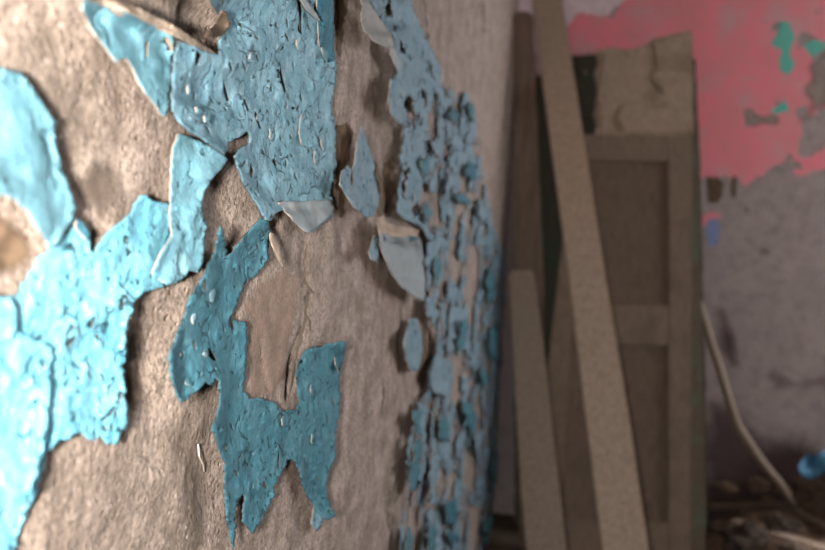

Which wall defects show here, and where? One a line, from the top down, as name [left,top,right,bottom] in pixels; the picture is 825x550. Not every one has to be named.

peeling [567,0,825,203]
peeling [0,0,506,550]
crack [288,244,314,400]